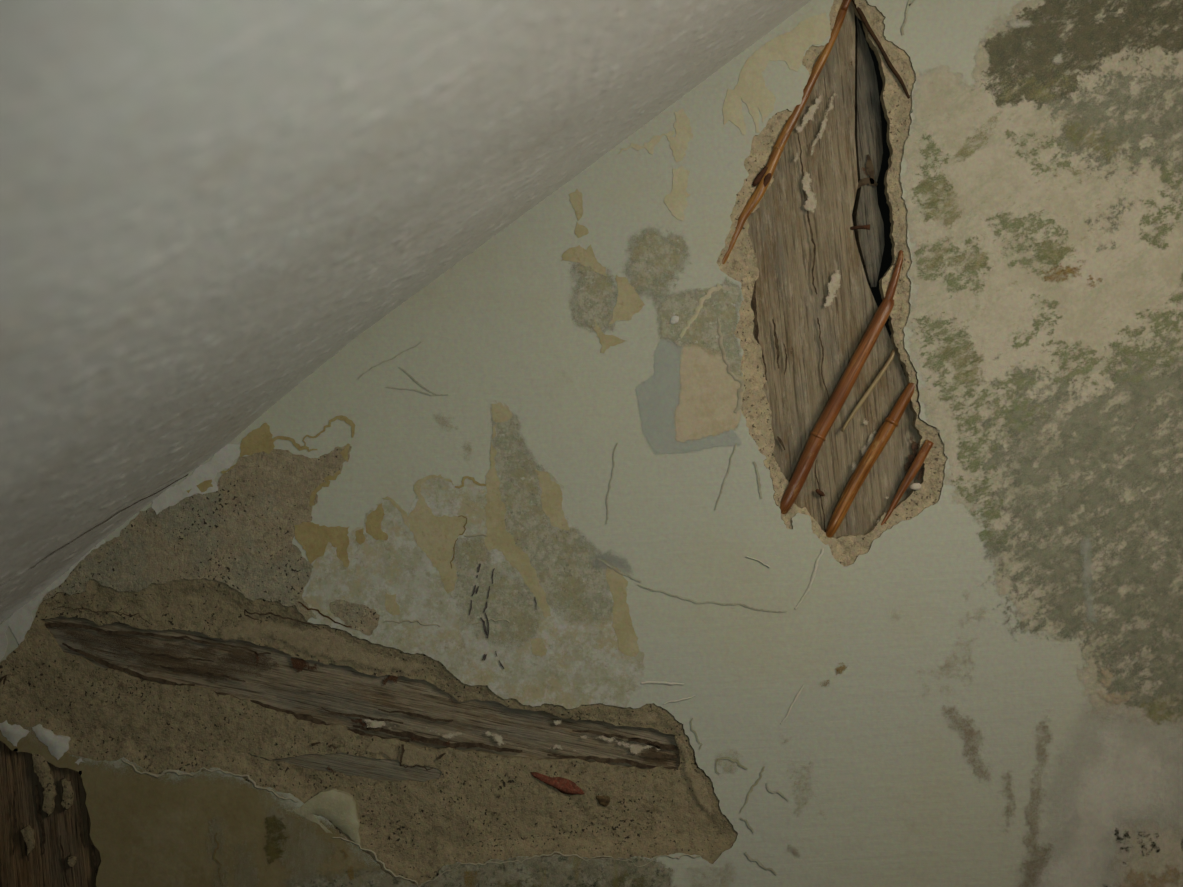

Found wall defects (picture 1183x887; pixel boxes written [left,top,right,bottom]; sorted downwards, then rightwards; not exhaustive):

flaking render [0,400,738,887]
leakage [281,855,674,887]
peeling [561,0,1183,746]
leakage [908,0,1183,887]
peeling [1106,818,1183,887]